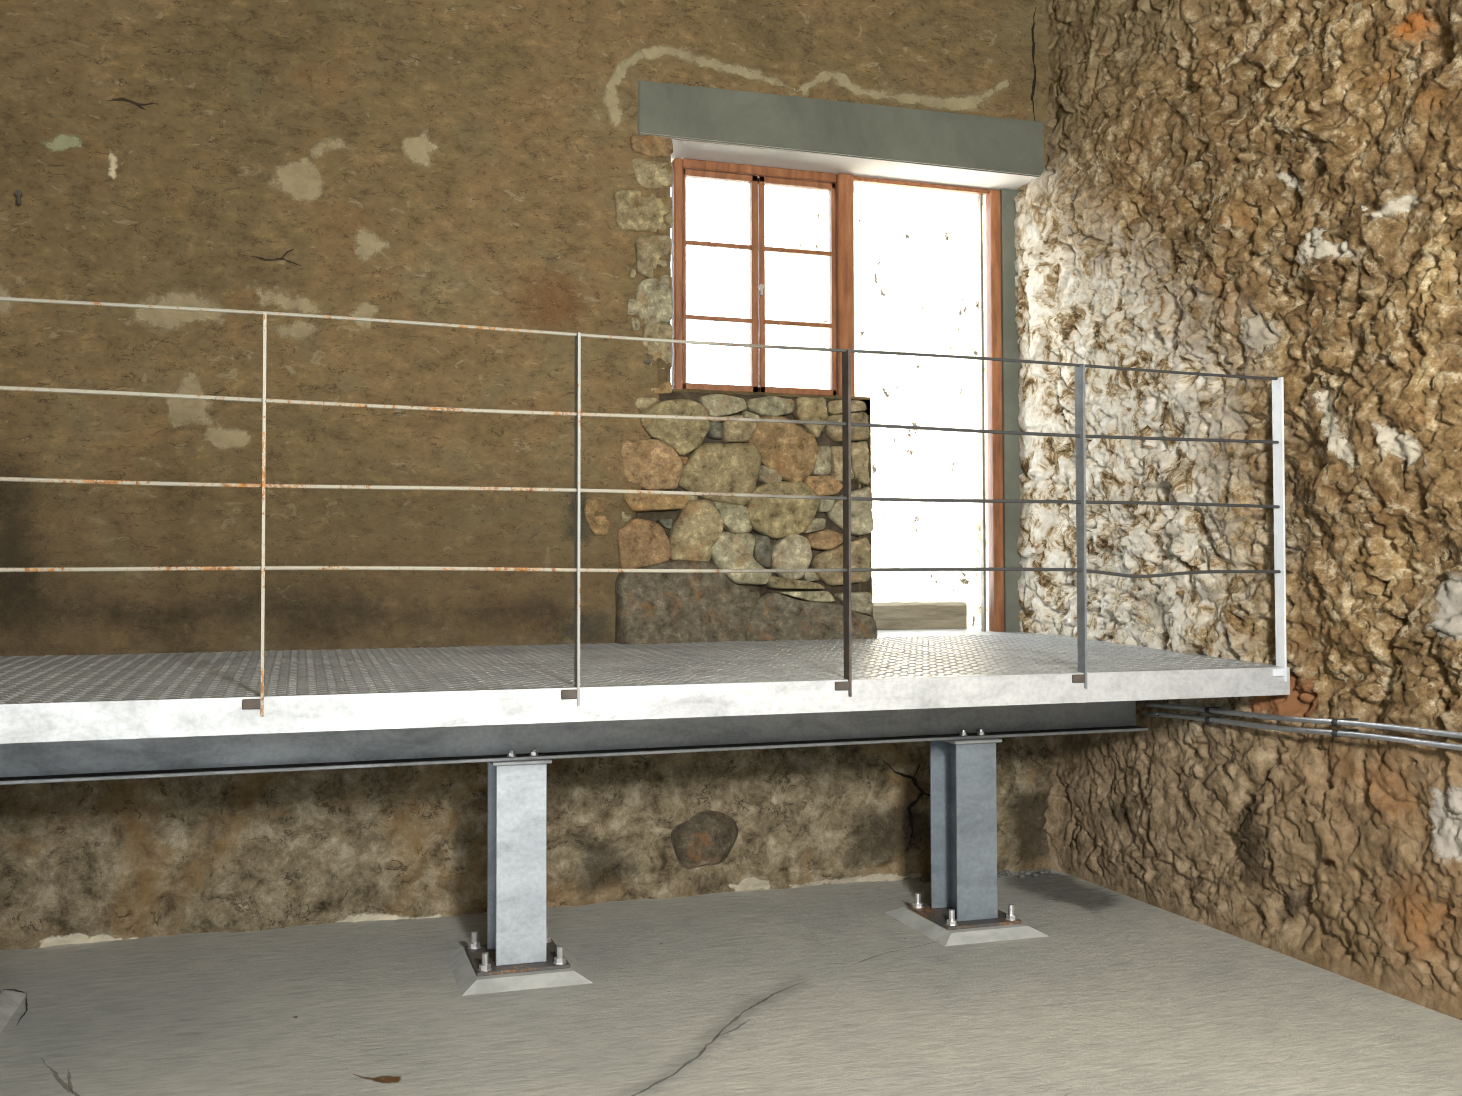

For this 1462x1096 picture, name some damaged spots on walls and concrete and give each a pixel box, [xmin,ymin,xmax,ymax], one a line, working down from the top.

flaking render [272,138,345,200]
flaking render [403,130,439,166]
flaking render [1275,172,1302,193]
flaking render [1362,194,1418,218]
flaking render [1298,227,1356,264]
flaking render [135,293,223,330]
flaking render [1312,387,1355,467]
flaking render [1371,423,1421,467]
flaking render [1428,571,1462,640]
crack [883,760,930,851]
flaking render [1430,787,1462,860]
crack [632,941,940,1096]